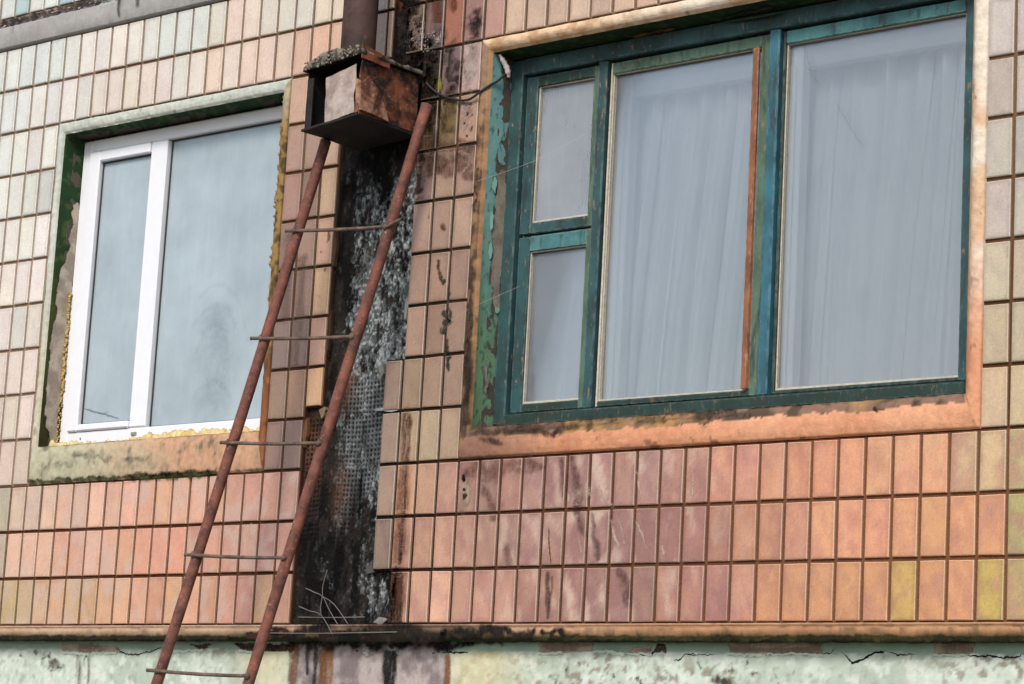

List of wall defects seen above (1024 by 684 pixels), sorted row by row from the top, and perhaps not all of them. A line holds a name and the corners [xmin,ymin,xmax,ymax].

damp [399,9,479,212]
peeling [488,169,506,313]
damp [462,267,617,444]
damp [281,567,579,684]
crack [640,644,717,661]
crack [824,648,913,664]
crack [969,652,1021,660]